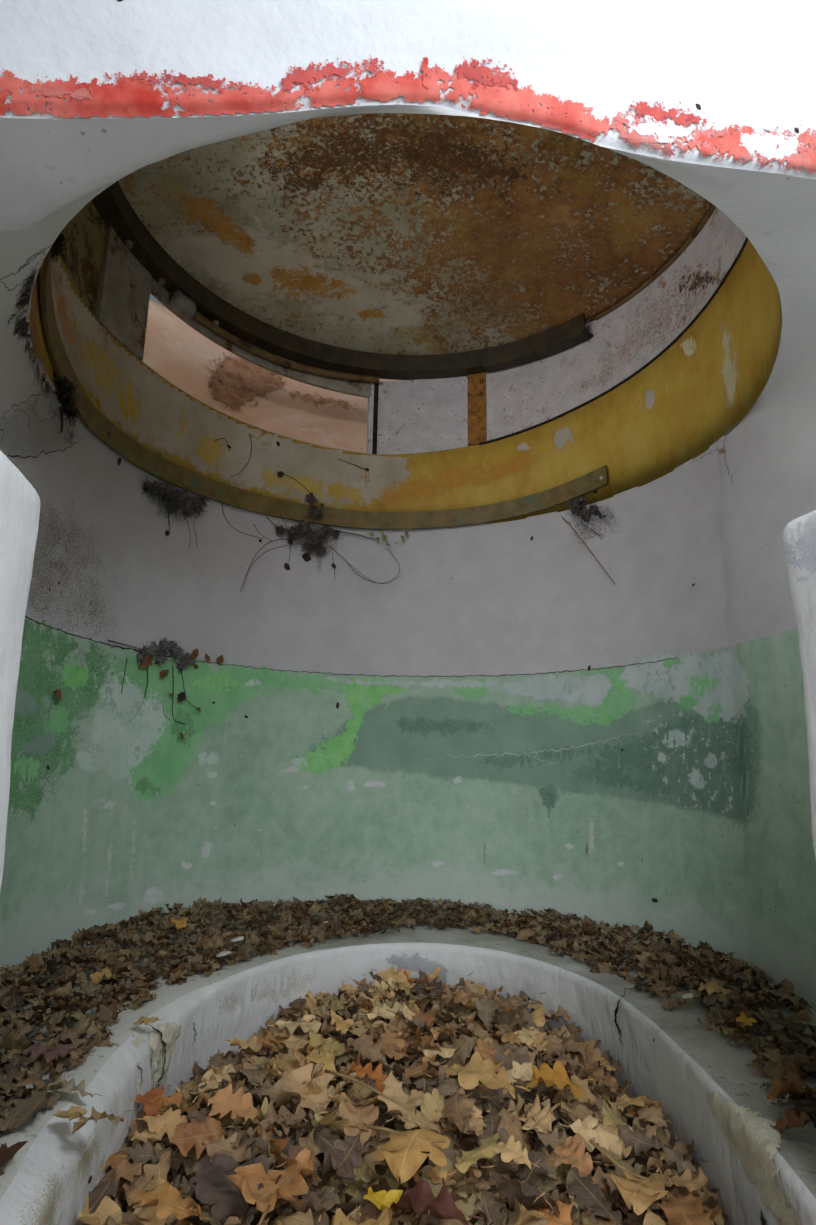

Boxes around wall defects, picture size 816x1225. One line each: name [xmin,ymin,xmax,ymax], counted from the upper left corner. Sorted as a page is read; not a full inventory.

rust [248,113,526,211]
peeling [0,55,816,175]
rust [178,194,385,321]
rust [581,263,722,392]
peeling [680,337,698,356]
leakage [26,471,139,668]
peeling [8,620,612,821]
spalling [707,1091,801,1225]